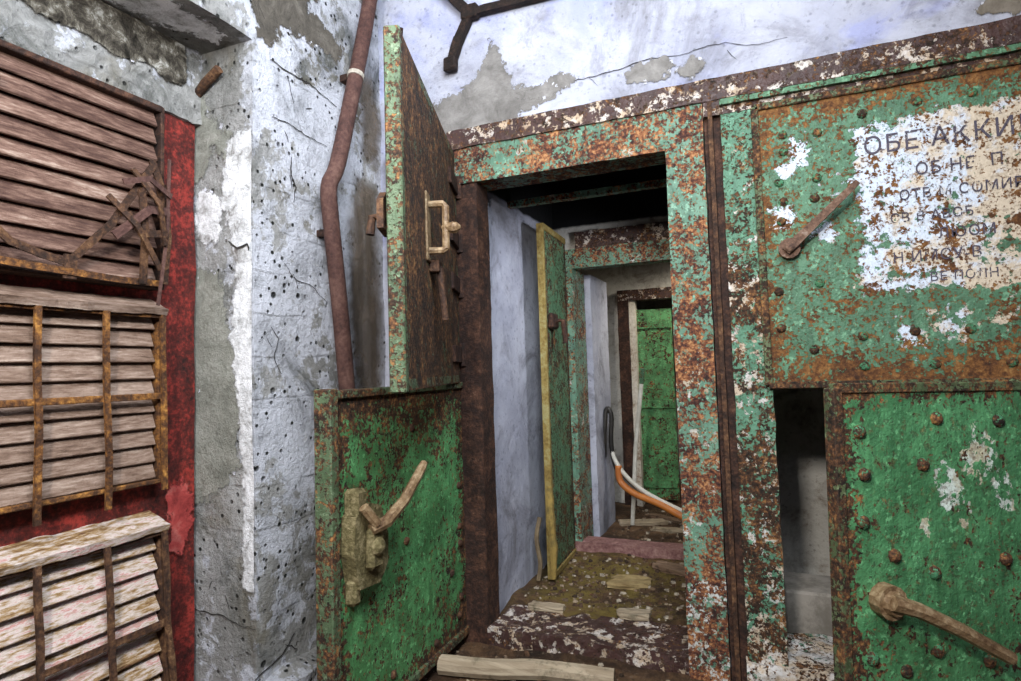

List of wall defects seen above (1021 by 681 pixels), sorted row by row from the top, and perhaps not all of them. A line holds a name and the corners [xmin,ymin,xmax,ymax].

peeling [973,0,1021,16]
peeling [433,38,577,134]